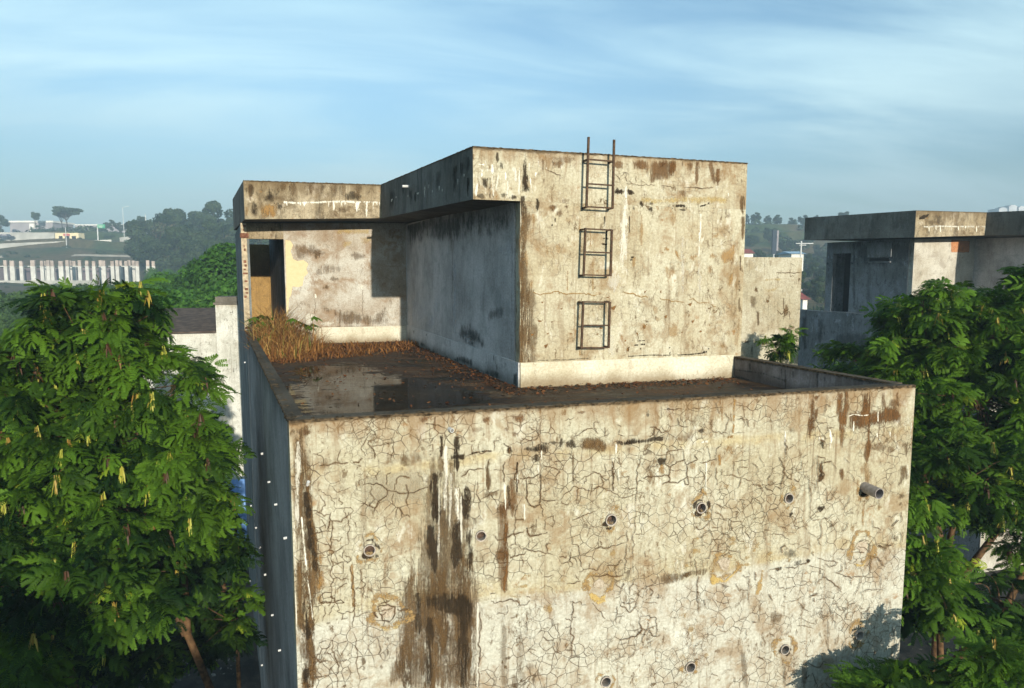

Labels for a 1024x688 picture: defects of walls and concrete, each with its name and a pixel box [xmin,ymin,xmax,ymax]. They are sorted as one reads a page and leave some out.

damp [408,153,547,363]
damp [290,426,320,688]
damp [387,435,663,688]
crack [303,403,903,688]
rust [808,396,819,435]
rust [837,392,901,461]